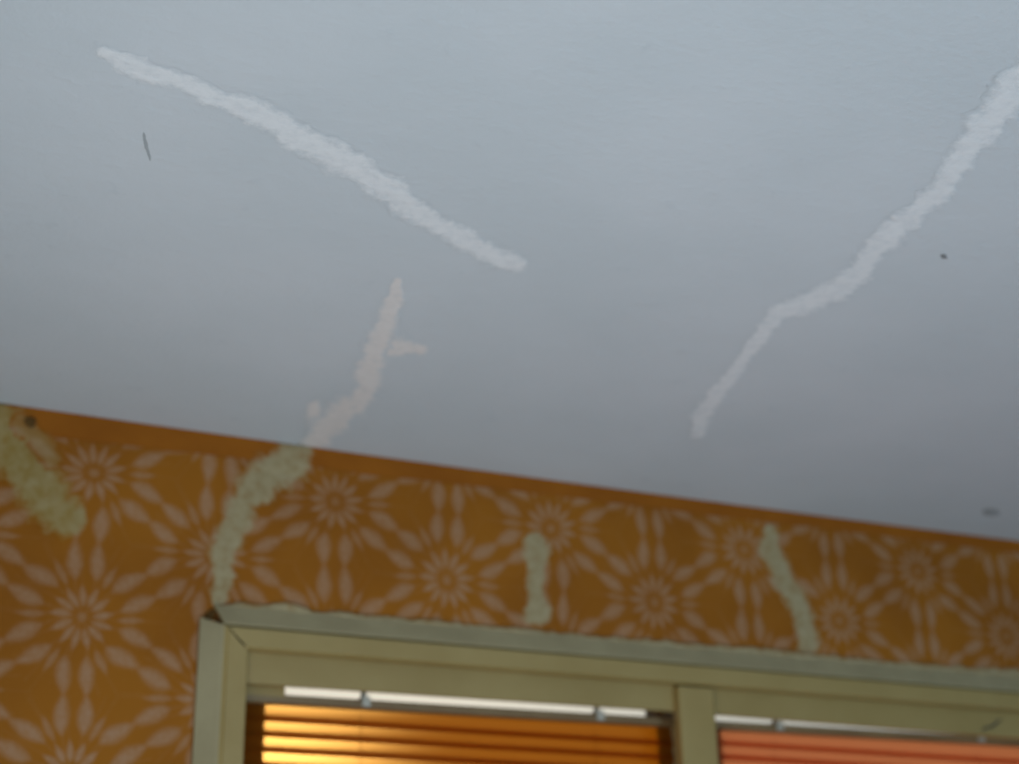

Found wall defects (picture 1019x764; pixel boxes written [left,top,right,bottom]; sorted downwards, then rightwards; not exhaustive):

crack [95,45,529,274]
crack [686,59,1019,438]
crack [0,392,88,545]
crack [202,278,429,607]
crack [514,530,557,628]
crack [755,524,824,654]